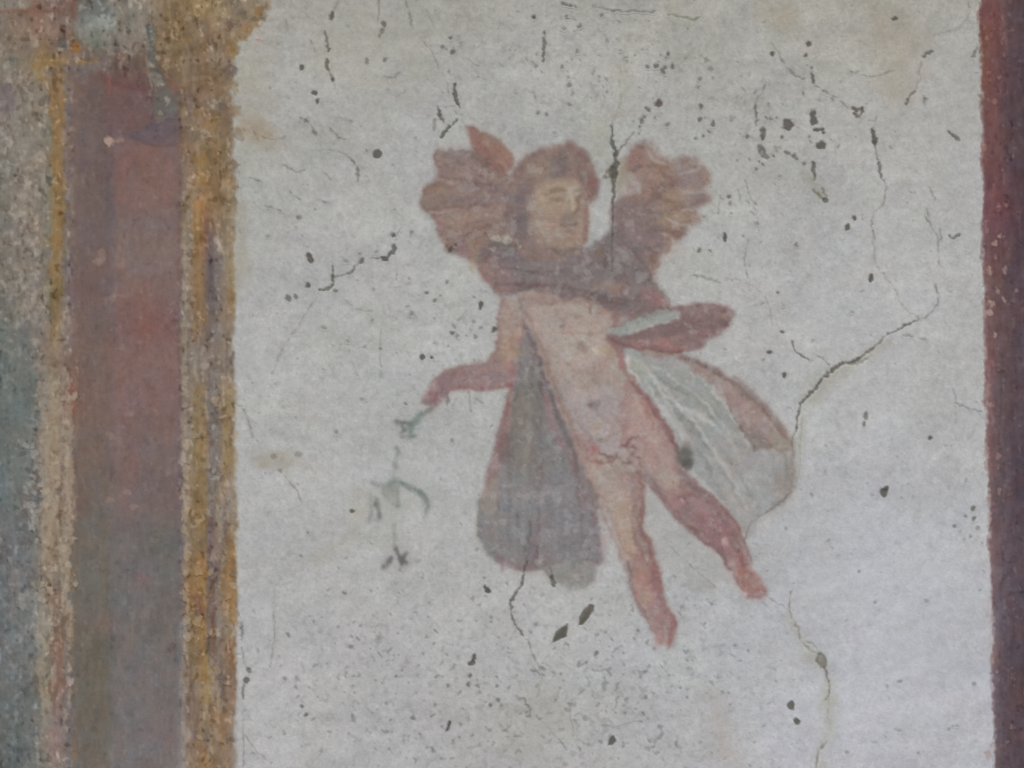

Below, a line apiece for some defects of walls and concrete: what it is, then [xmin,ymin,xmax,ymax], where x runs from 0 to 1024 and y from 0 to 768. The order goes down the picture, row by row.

crack [601,78,635,274]
spalling [780,118,796,132]
spalling [783,150,807,167]
spalling [808,108,828,151]
crack [270,227,412,382]
crack [688,1,983,546]
spalling [551,603,595,645]
crack [508,560,650,747]
crack [764,590,843,768]